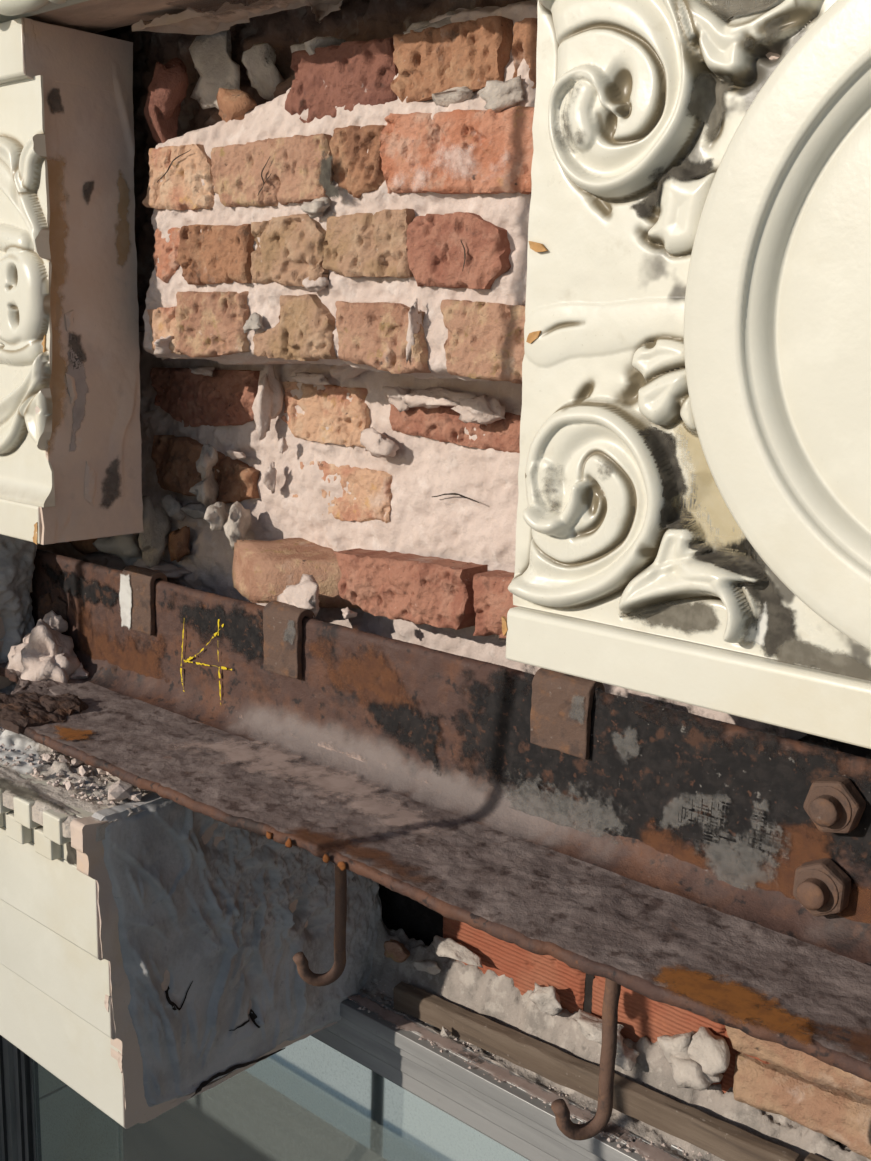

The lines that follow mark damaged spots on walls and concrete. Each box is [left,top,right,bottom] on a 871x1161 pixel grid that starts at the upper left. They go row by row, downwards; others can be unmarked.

spalling [132,0,342,35]
spalling [144,58,189,144]
spalling [216,88,257,122]
water stain [680,426,742,550]
water stain [745,613,768,645]
rust [39,694,93,741]
spalling [798,735,871,759]
rust [285,828,422,882]
rust [743,824,830,900]
spalling [378,884,443,946]
rust [836,887,871,924]
rust [654,966,871,1062]